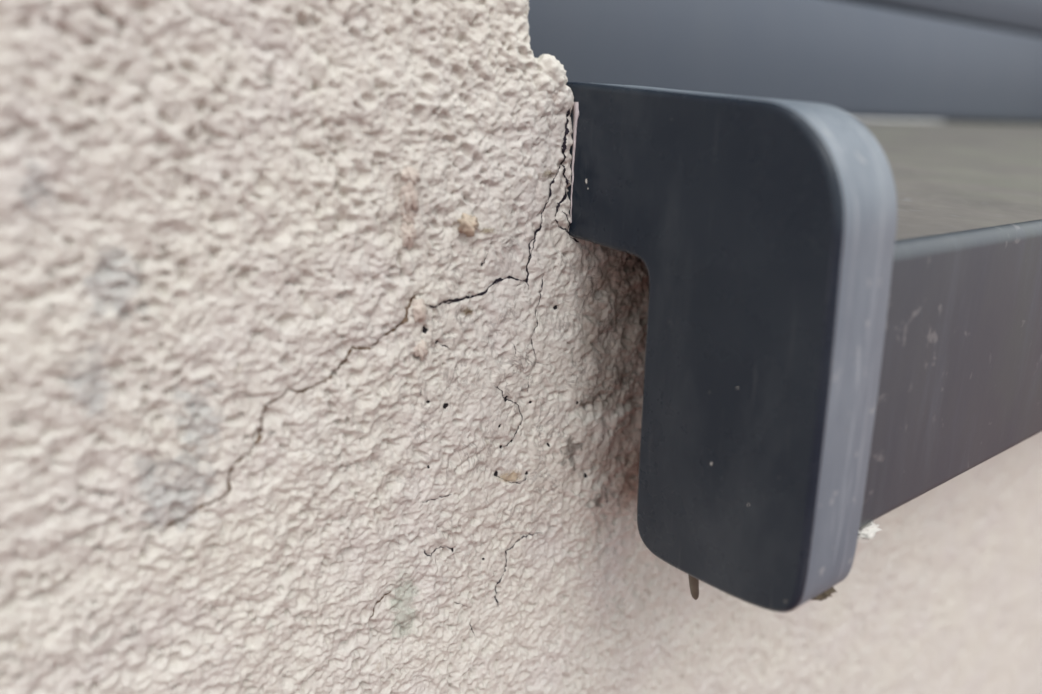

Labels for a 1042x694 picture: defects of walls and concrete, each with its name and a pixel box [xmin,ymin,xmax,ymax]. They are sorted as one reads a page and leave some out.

crack [166,109,579,527]
crack [494,533,534,607]